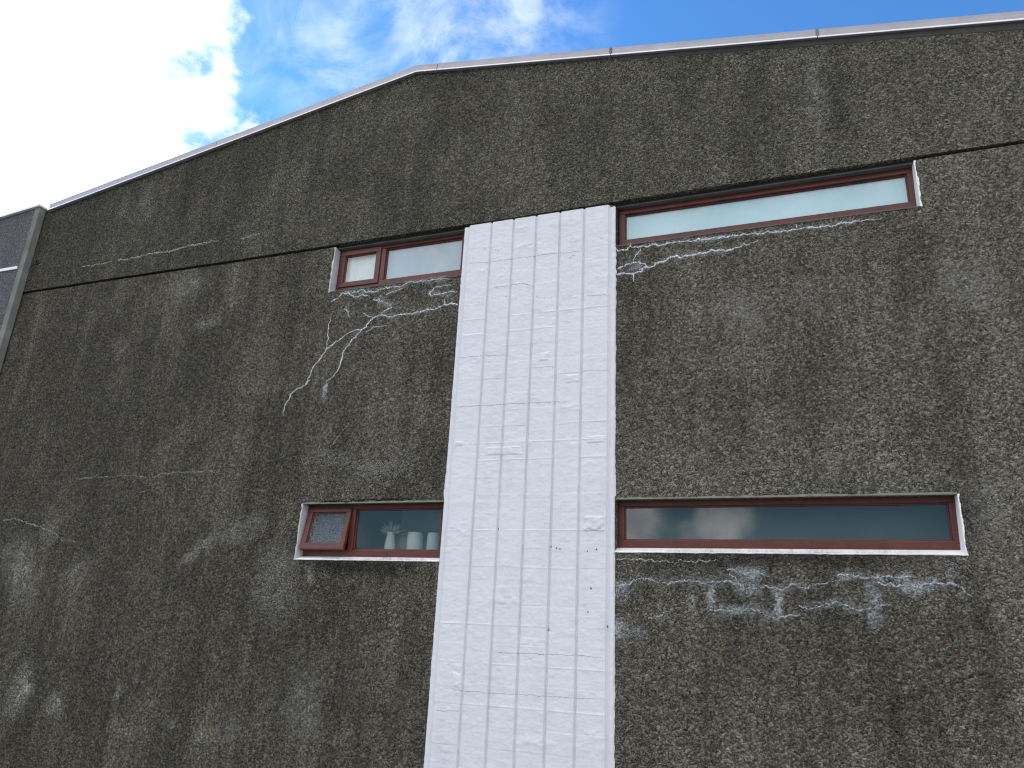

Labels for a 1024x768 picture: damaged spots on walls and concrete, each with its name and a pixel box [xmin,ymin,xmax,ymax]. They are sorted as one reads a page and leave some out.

crack [587,218,882,296]
crack [282,276,458,413]
crack [616,558,972,620]